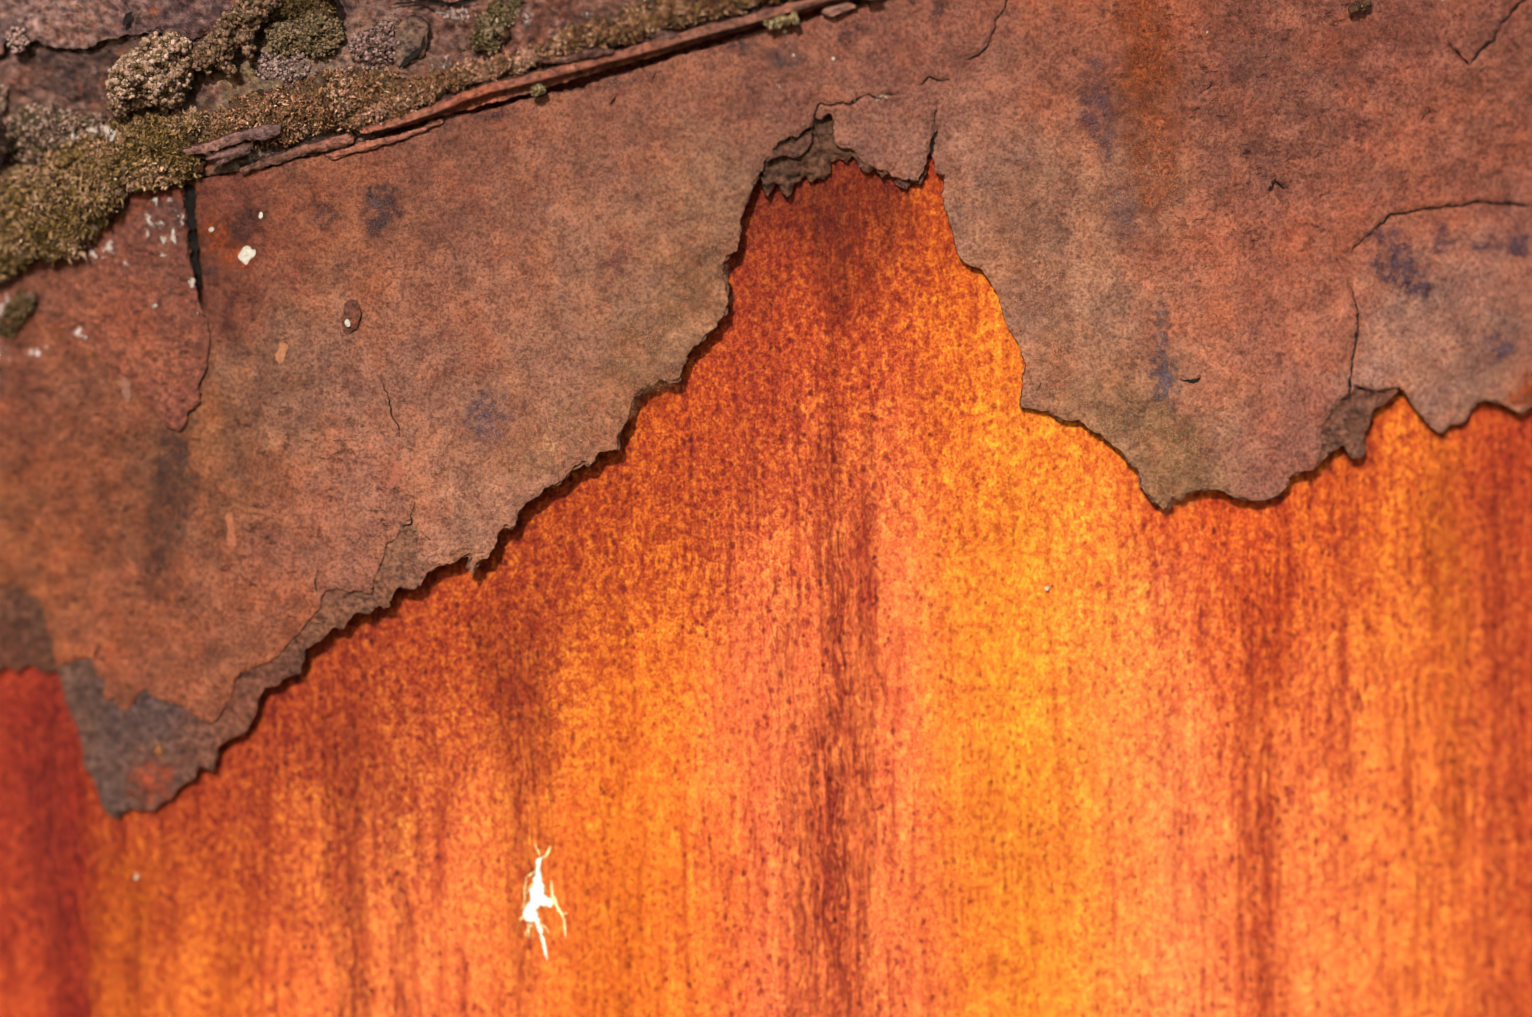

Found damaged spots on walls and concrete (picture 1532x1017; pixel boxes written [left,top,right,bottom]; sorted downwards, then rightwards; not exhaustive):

corrosion [0,0,235,104]
damp [434,6,470,20]
corrosion [360,0,852,133]
crack [1446,0,1525,65]
damp [70,125,116,141]
damp [145,197,184,257]
crack [181,184,203,303]
peeling [238,246,256,265]
crack [1339,200,1532,401]
peeling [275,342,288,364]
peeling [225,512,237,549]
corrosion [810,390,871,1017]